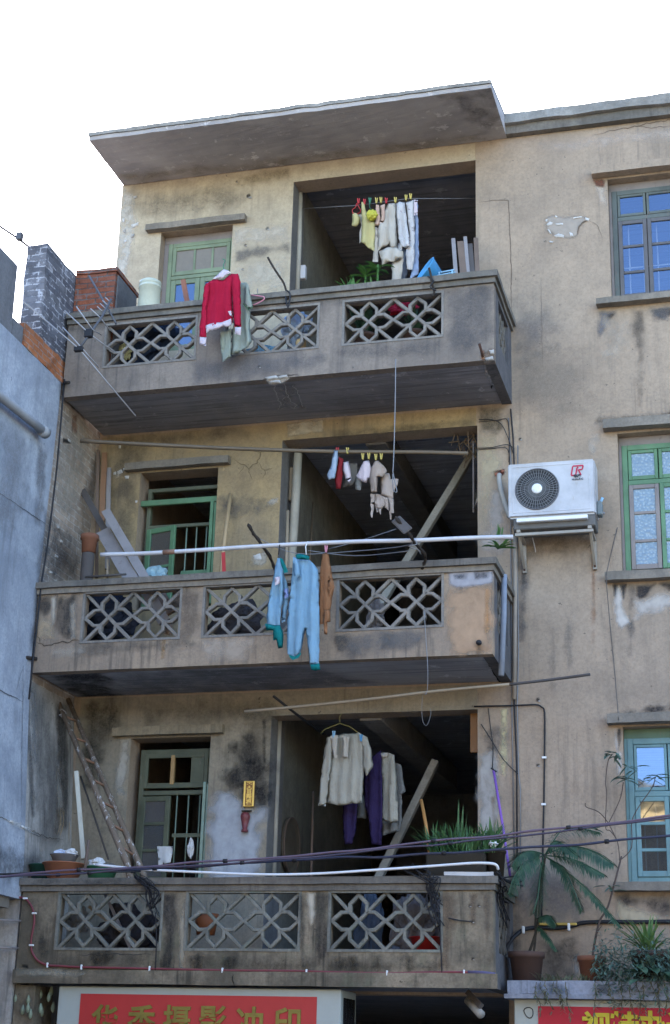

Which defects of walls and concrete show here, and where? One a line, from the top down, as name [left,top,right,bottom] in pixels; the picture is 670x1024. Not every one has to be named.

flaking render [546,216,602,243]
leakage [57,708,68,826]